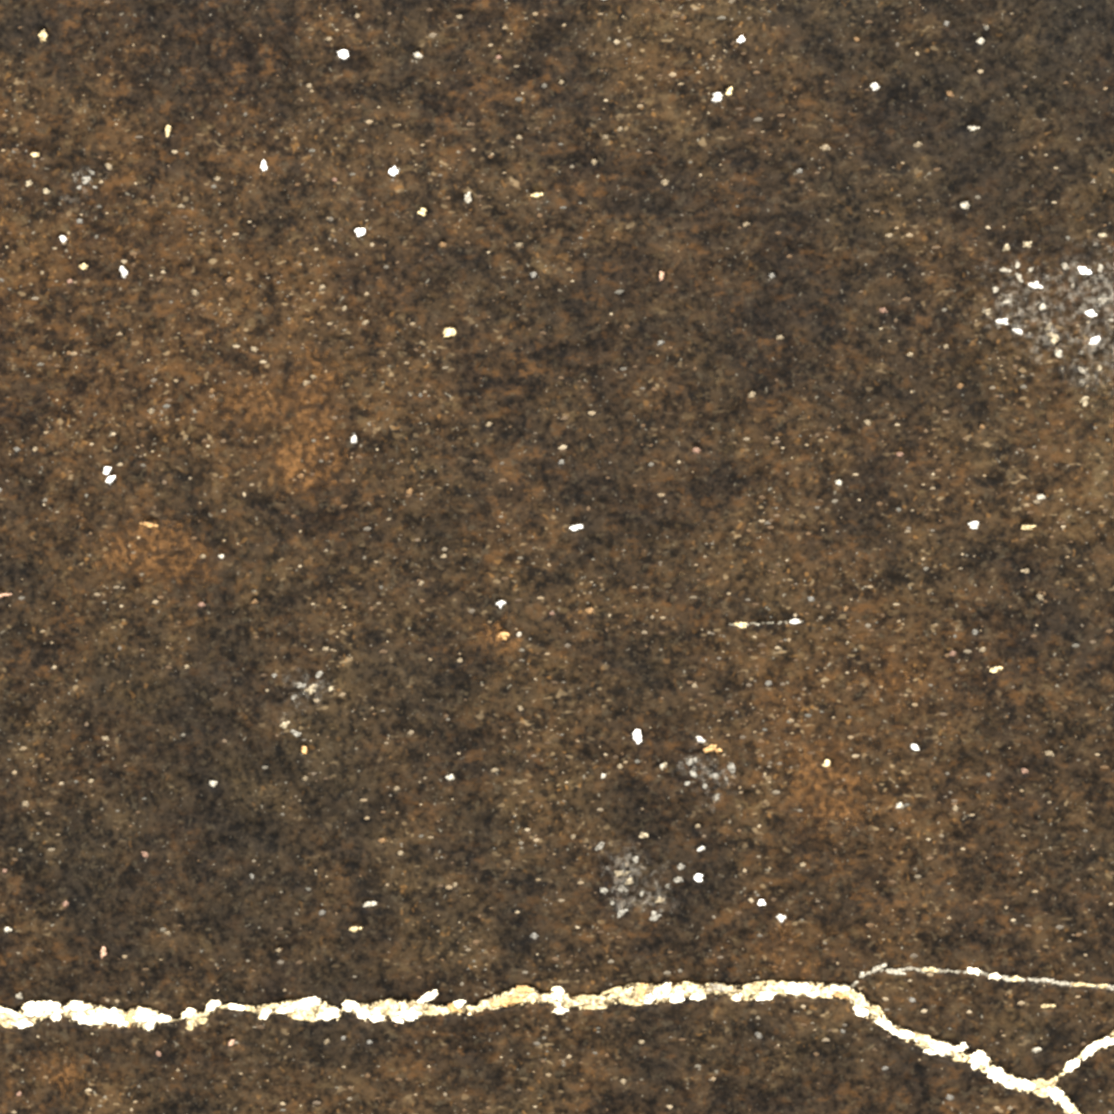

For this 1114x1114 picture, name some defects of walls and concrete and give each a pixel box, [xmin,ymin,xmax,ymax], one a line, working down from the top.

crack [0,963,1114,1114]